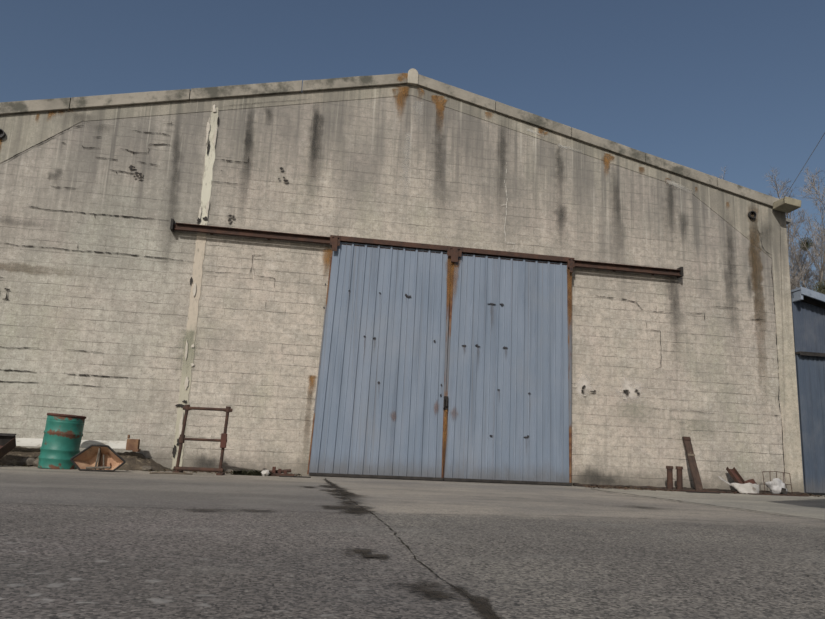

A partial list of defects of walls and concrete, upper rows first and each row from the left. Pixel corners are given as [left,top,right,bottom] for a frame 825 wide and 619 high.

rust [393,73,408,107]
crack [5,122,174,174]
peeling [206,104,219,155]
water stain [313,114,322,152]
water stain [749,213,763,323]
peeling [573,378,596,396]
peeling [619,380,640,399]